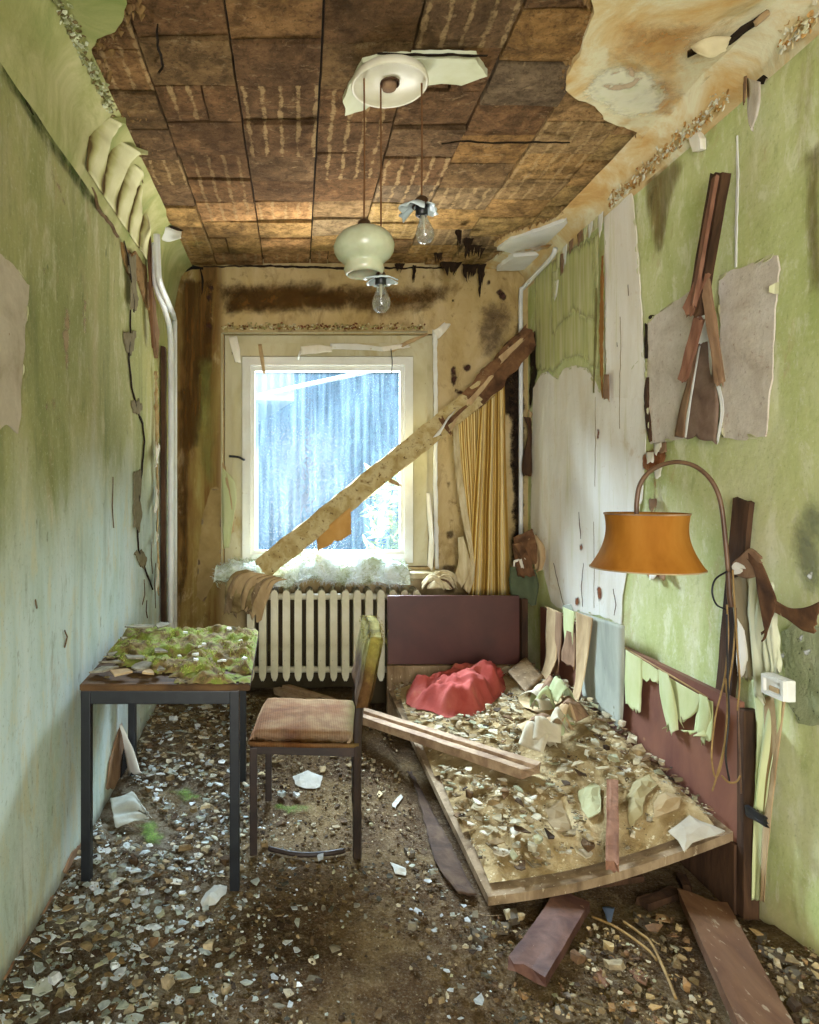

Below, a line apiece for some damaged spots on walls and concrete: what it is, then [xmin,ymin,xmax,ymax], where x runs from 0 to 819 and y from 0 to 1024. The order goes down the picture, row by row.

peeling [687,9,770,58]
flaking render [777,0,819,55]
peeling [743,75,767,131]
peeling [0,254,30,434]
flaking render [53,0,730,702]
leakage [451,365,471,394]
leakage [481,280,506,351]
leakage [180,280,453,603]
peeling [519,701,560,715]
peeling [624,647,713,745]